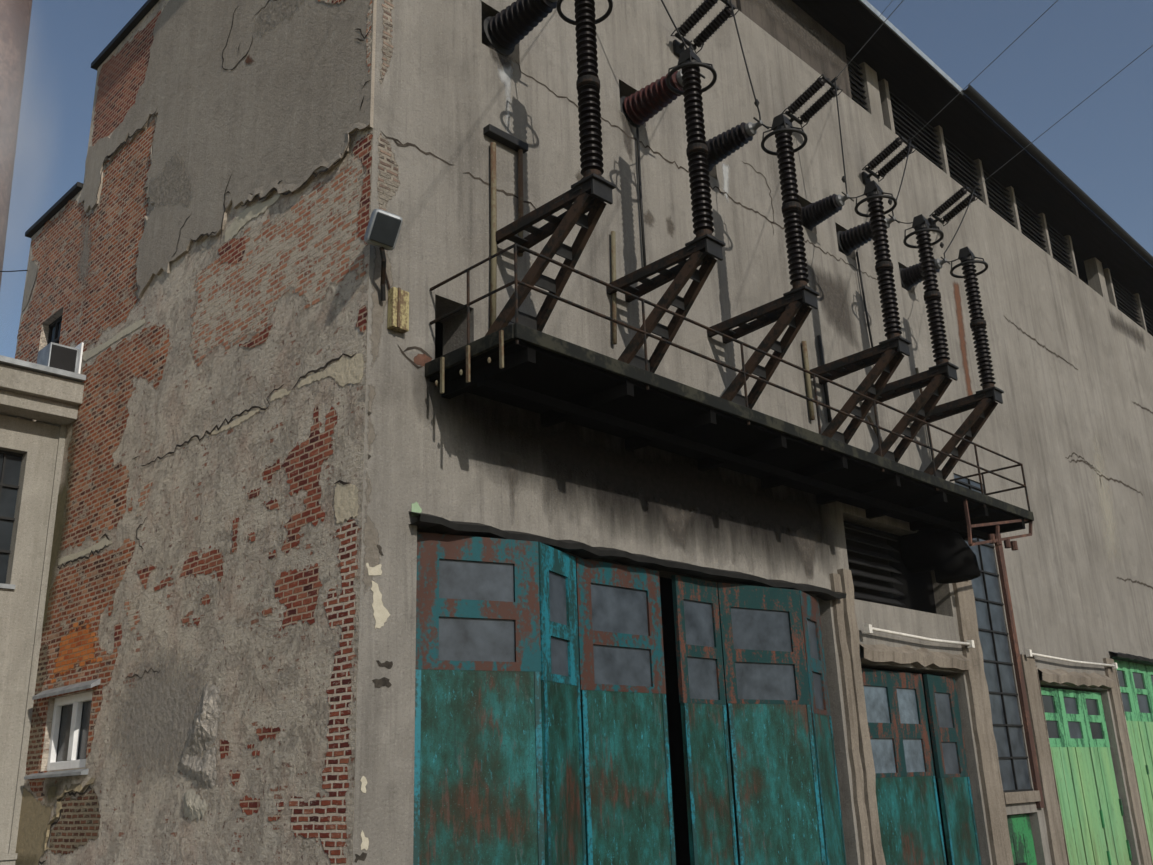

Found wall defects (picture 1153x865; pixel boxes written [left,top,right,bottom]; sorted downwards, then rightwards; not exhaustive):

crack [222,0,277,71]
spalling [366,0,394,84]
crack [174,172,233,254]
spalling [189,120,400,366]
spalling [15,7,255,865]
crack [133,353,356,466]
spalling [247,403,338,559]
crack [1065,452,1142,494]
crack [1117,577,1153,589]
spalling [239,519,393,865]